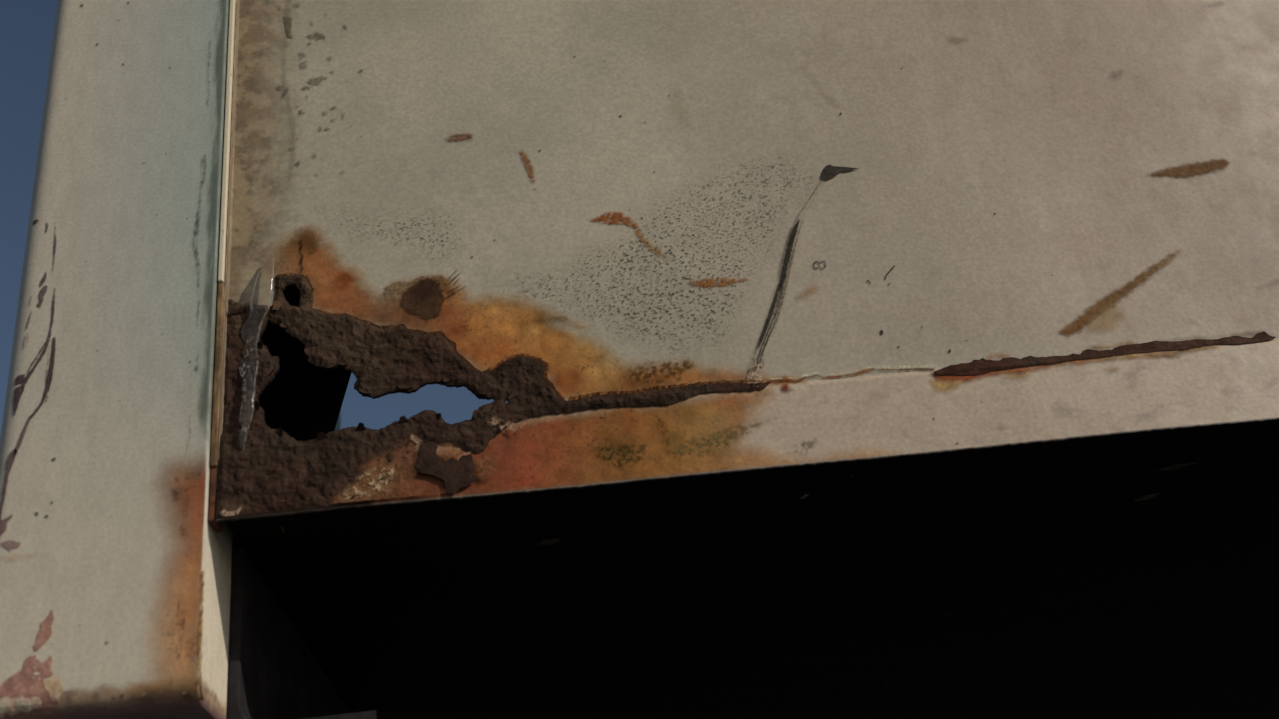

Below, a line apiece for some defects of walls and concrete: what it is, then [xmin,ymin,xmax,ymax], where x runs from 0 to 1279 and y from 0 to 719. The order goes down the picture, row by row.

corrosion [1151,159,1229,178]
corrosion [591,212,666,258]
corrosion [1060,250,1180,335]
corrosion [932,331,1276,391]
corrosion [160,228,804,702]
peeling [0,609,62,719]